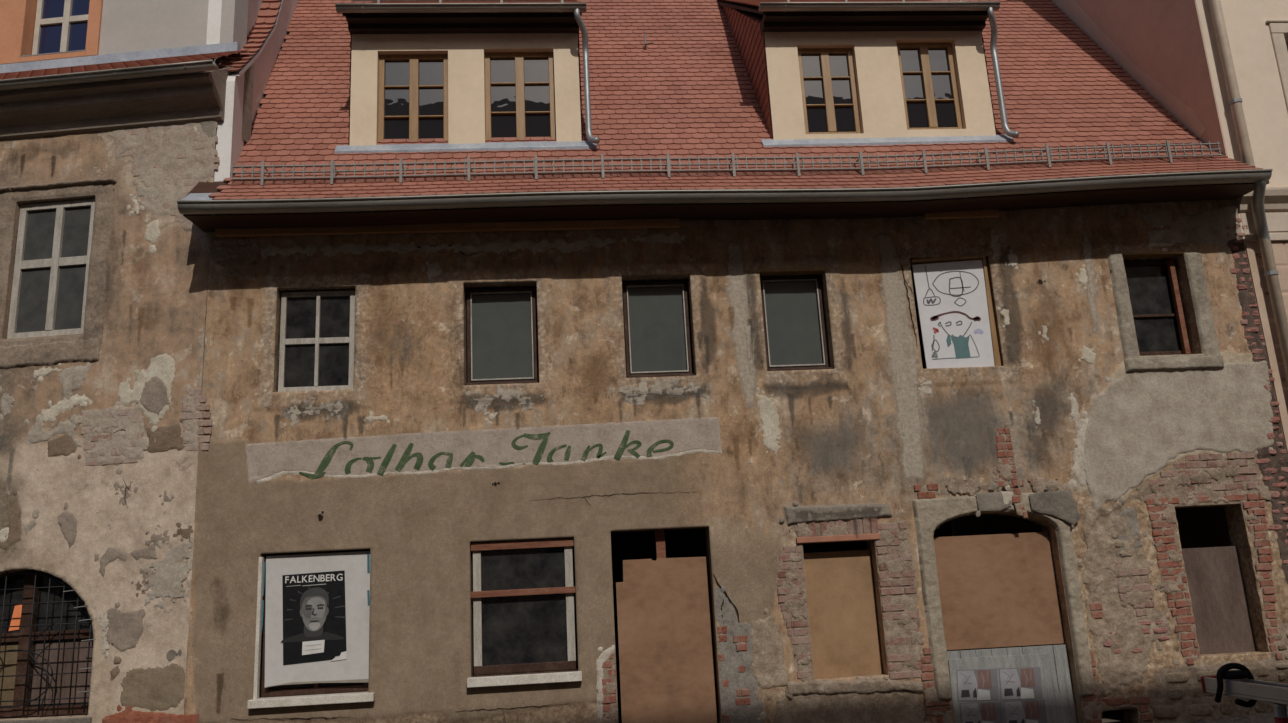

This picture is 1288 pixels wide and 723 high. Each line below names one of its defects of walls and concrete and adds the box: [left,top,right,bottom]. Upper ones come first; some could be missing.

flaking render [998,304,1010,331]
flaking render [24,328,212,506]
flaking render [914,393,1088,529]
flaking render [1075,201,1288,723]
flaking render [99,603,122,681]
flaking render [131,523,193,609]
spalling [166,649,182,661]
flaking render [591,645,618,723]
spalling [714,586,766,723]
flaking render [776,510,955,723]